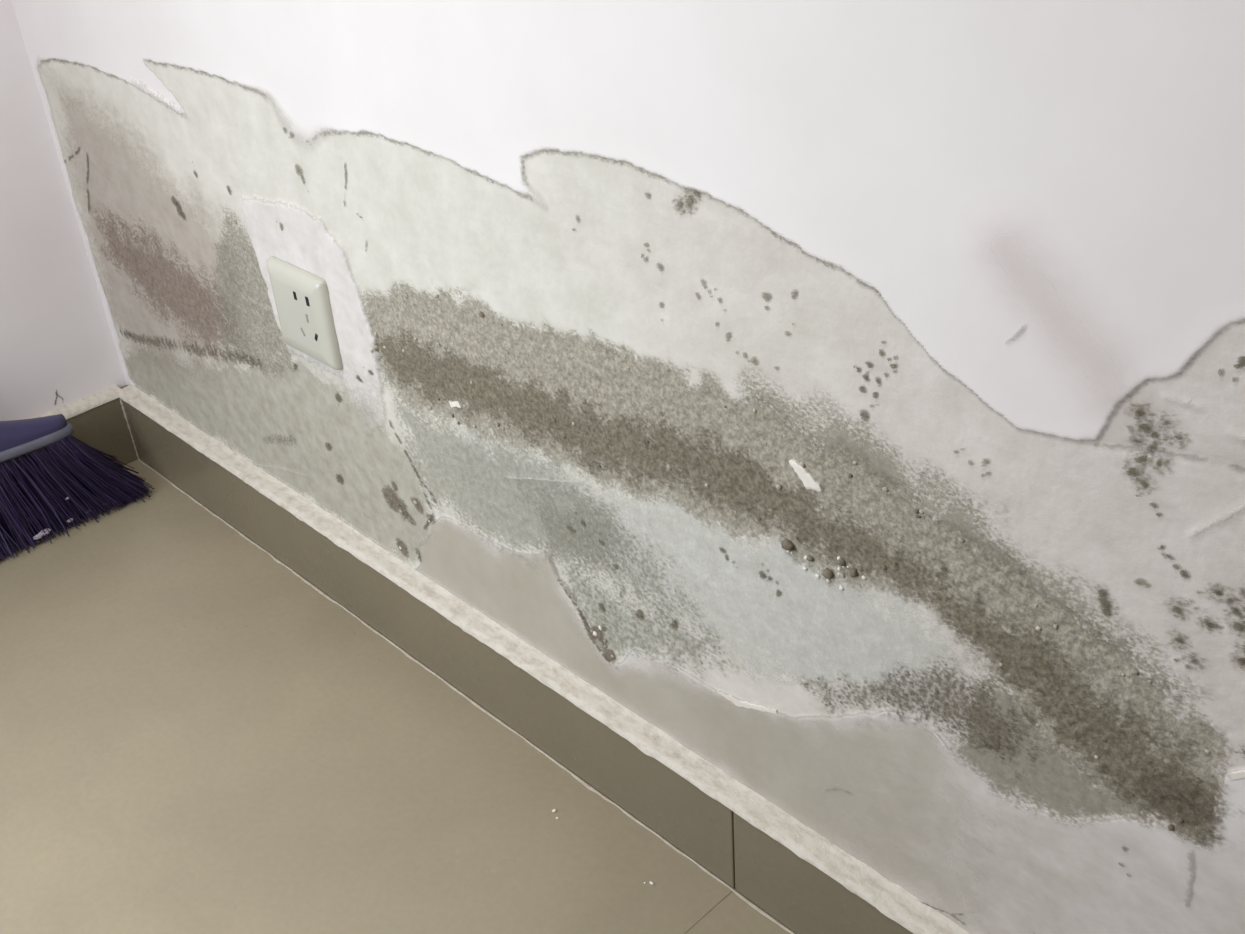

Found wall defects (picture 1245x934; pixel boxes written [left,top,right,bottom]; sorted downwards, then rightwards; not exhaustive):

flaking render [381,482,415,525]
leakage [695,280,1245,700]
peeling [365,536,421,570]
leakage [96,211,1147,897]
peeling [805,554,856,656]
peeling [958,751,1141,822]
peeling [1136,803,1176,826]